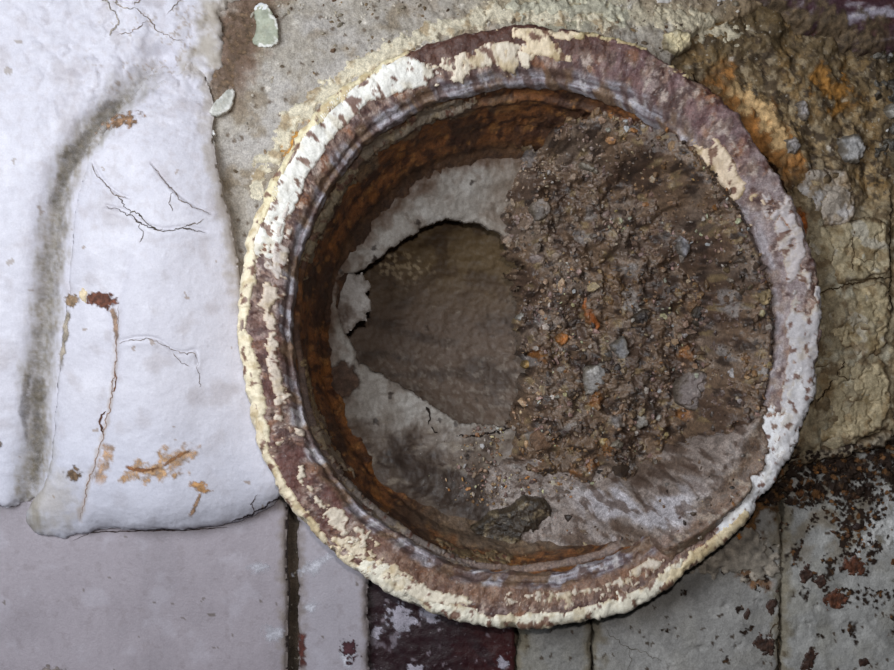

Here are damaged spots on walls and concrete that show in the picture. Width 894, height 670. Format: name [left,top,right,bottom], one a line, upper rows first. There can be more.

crack [120,0,180,40]
corrosion [809,61,856,116]
corrosion [705,63,805,180]
crack [92,164,211,239]
corrosion [60,288,119,364]
peeling [237,27,822,630]
corrosion [331,360,360,398]
crack [73,308,280,541]
corrosion [96,444,114,479]
corrosion [121,447,196,483]
corrosion [190,481,209,515]